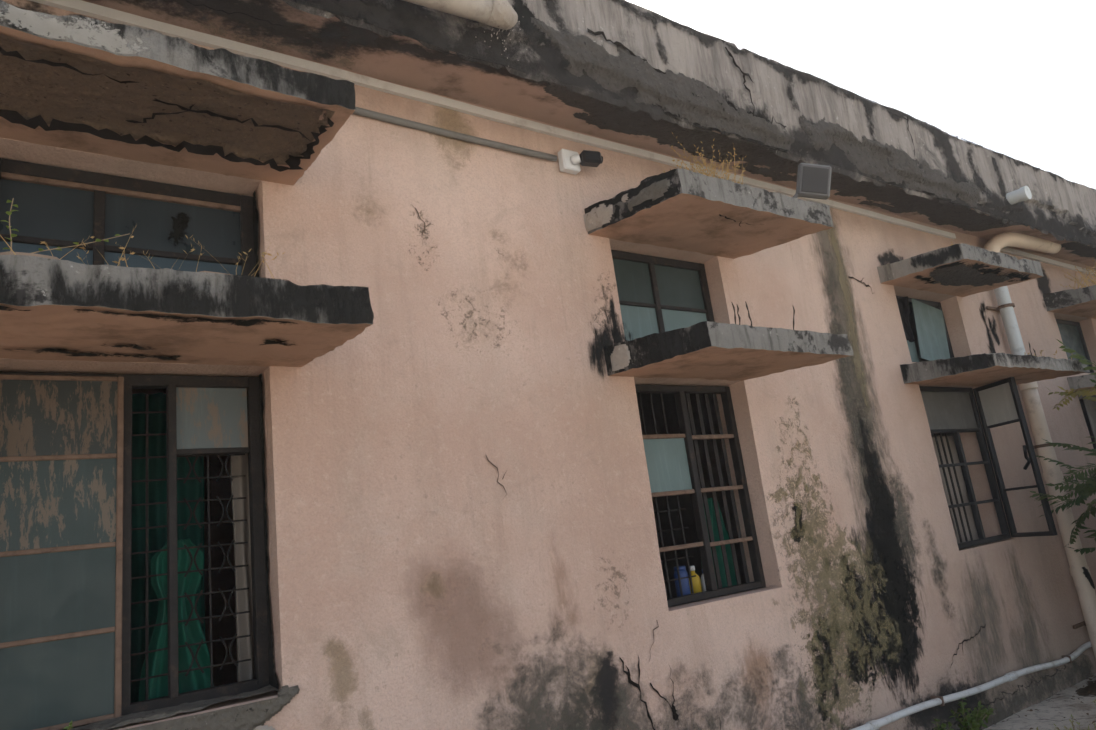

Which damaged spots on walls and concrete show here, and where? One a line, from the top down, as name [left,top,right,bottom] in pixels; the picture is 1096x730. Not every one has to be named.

leakage [0,0,152,54]
spalling [0,34,335,172]
leakage [114,0,638,109]
spalling [531,17,1019,232]
leakage [612,0,1096,245]
leakage [588,169,678,219]
leakage [49,191,374,327]
leakage [589,292,711,377]
leakage [817,227,1093,730]
peeling [277,685,300,702]
leakage [484,651,790,730]
crack [620,620,679,730]